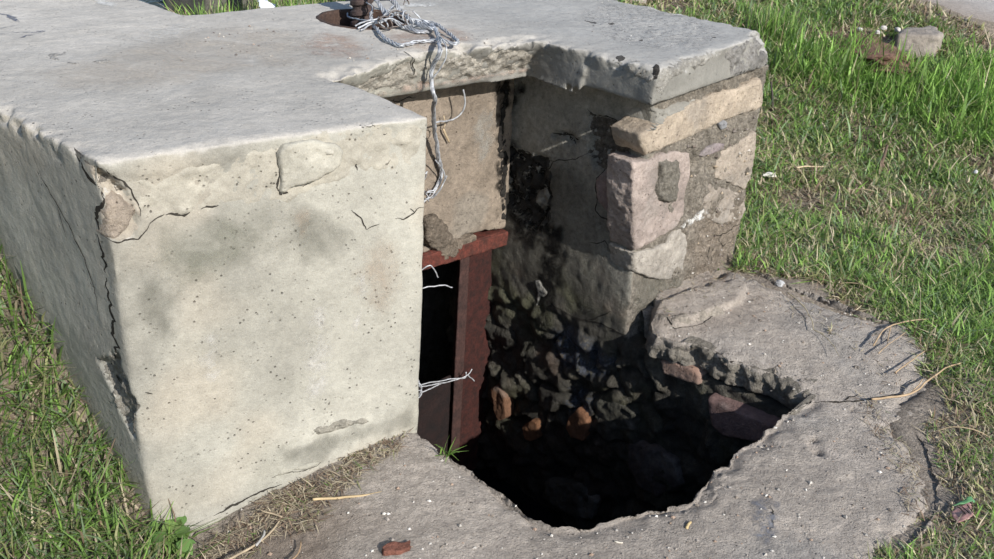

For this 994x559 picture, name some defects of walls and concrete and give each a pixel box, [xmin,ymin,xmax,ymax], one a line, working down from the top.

spalling [357,45,547,92]
damp [496,79,525,140]
spalling [74,124,430,243]
crack [352,207,424,230]
damp [496,144,565,302]
crack [33,156,122,384]
crack [814,394,906,403]
crack [214,484,282,516]
spalling [682,471,727,514]